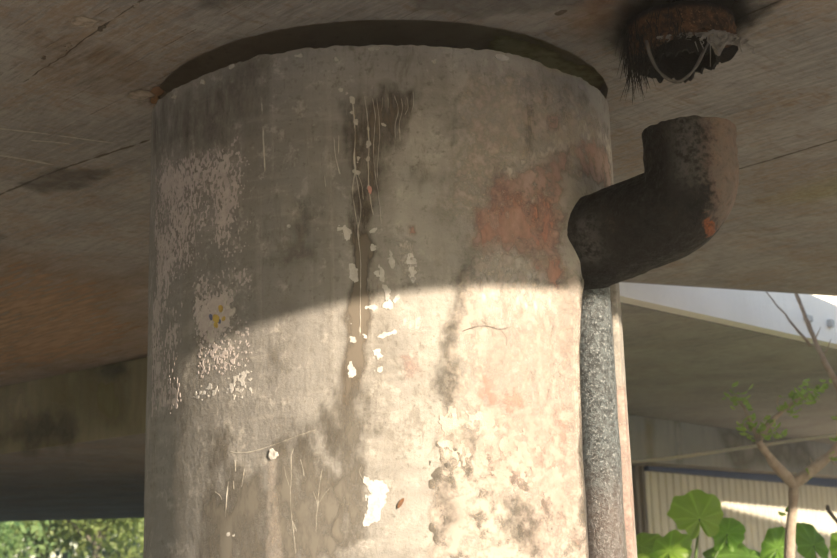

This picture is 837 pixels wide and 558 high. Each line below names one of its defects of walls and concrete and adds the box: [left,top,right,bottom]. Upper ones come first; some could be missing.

peeling [337,225,352,241]
peeling [151,136,252,417]
peeling [349,263,359,283]
peeling [365,250,400,311]
peeling [406,253,417,283]
water stain [200,87,414,558]
spalling [429,253,587,558]